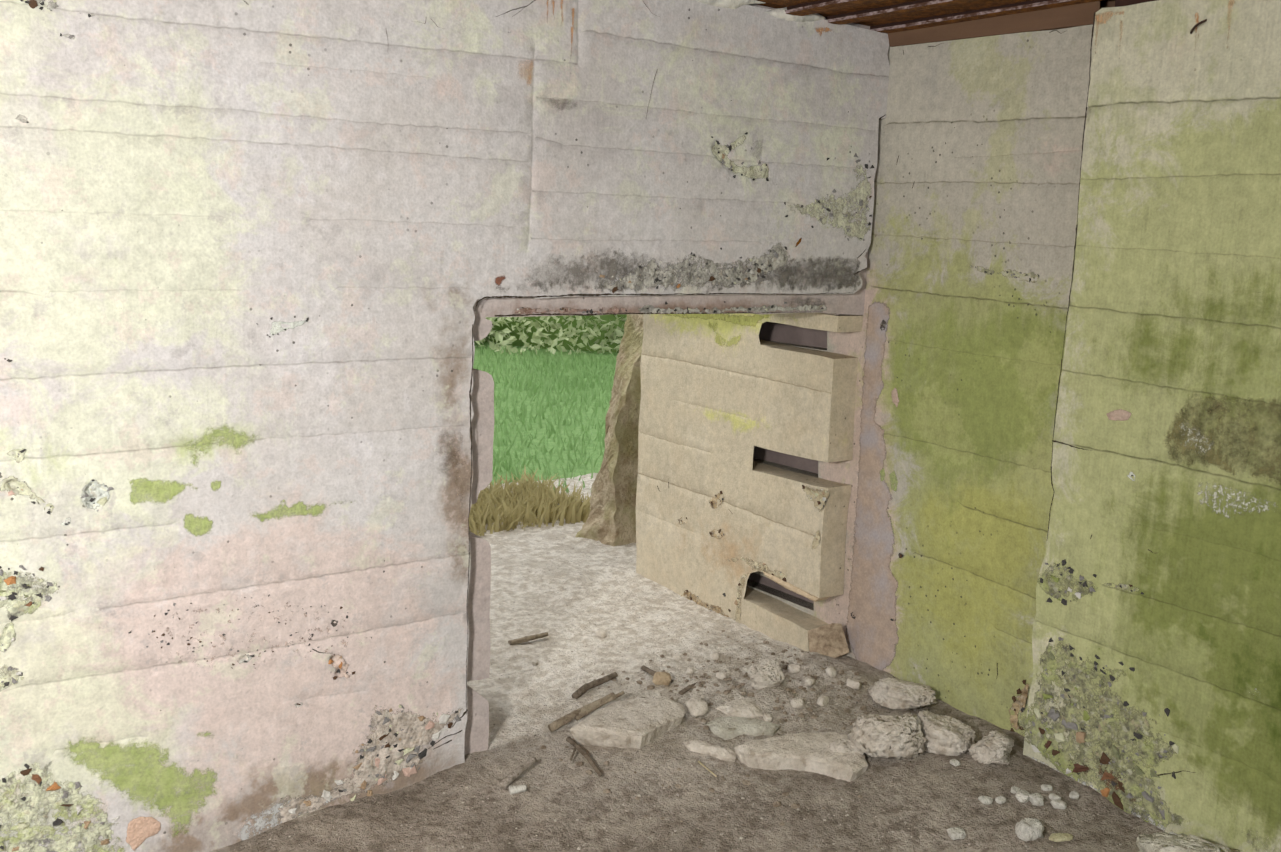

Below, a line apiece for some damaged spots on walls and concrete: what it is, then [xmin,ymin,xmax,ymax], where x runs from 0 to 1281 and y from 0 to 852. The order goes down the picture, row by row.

spalling [784,153,874,241]
leakage [532,251,655,291]
leakage [675,258,860,308]
leakage [1167,399,1281,484]
spalling [0,622,16,652]